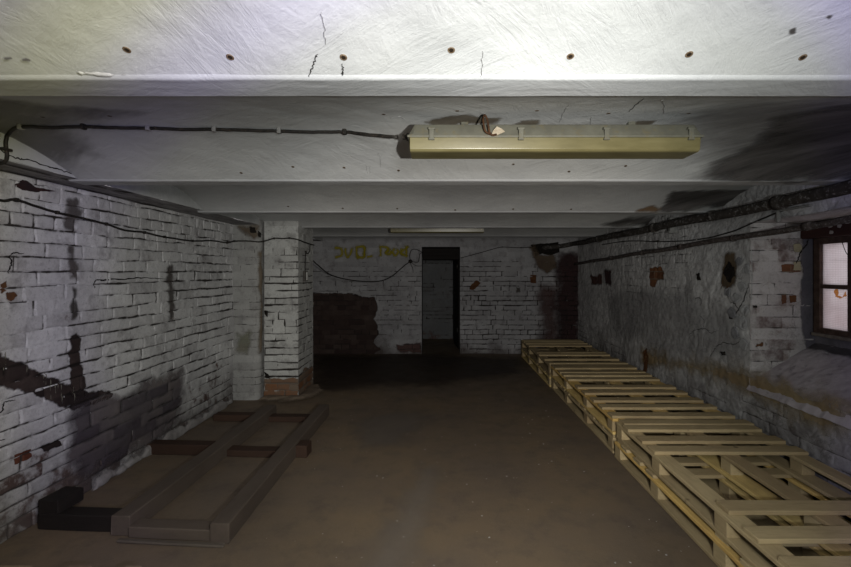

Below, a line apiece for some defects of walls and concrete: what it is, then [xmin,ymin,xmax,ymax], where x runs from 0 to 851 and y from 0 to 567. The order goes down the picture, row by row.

crack [308,12,326,76]
water stain [64,198,82,233]
water stain [68,246,78,277]
flaking render [649,266,664,287]
spalling [723,261,735,283]
water stain [70,289,78,319]
flaking render [313,293,380,354]